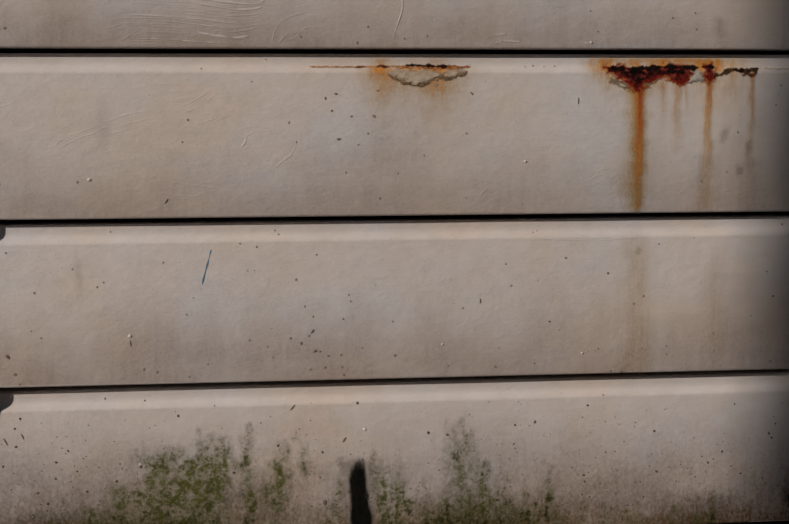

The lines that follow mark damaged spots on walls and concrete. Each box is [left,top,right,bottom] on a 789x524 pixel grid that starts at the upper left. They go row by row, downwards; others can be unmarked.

rust [310,59,470,96]
peeling [387,69,467,87]
rust [590,58,779,208]
water stain [349,463,371,524]